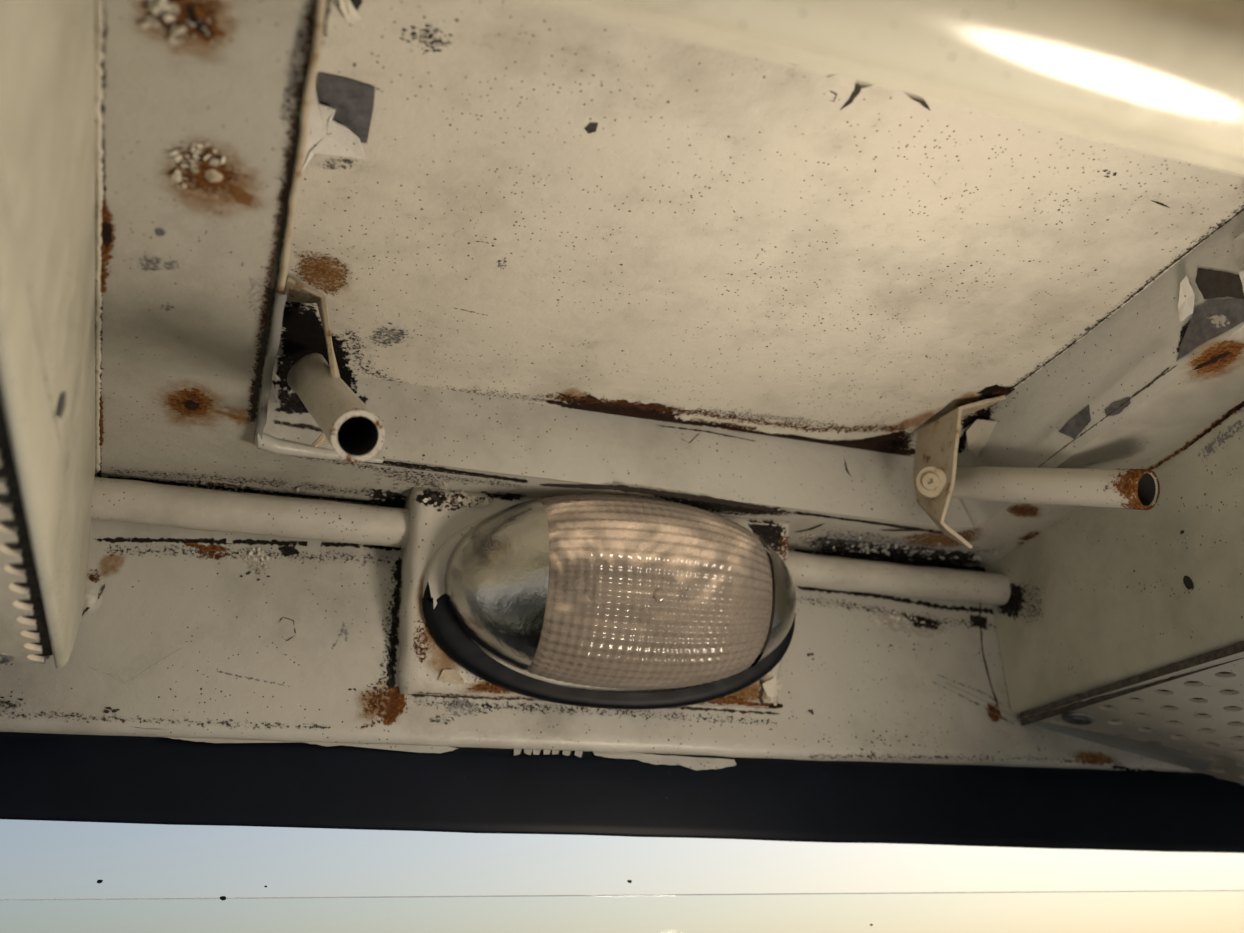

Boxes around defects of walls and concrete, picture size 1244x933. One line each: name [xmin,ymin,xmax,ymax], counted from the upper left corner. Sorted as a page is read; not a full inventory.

corrosion [140,0,229,52]
corrosion [167,140,254,208]
corrosion [291,251,352,298]
corrosion [1189,341,1244,377]
corrosion [164,388,254,423]
corrosion [546,390,934,457]
corrosion [1105,401,1244,510]
corrosion [348,683,408,729]